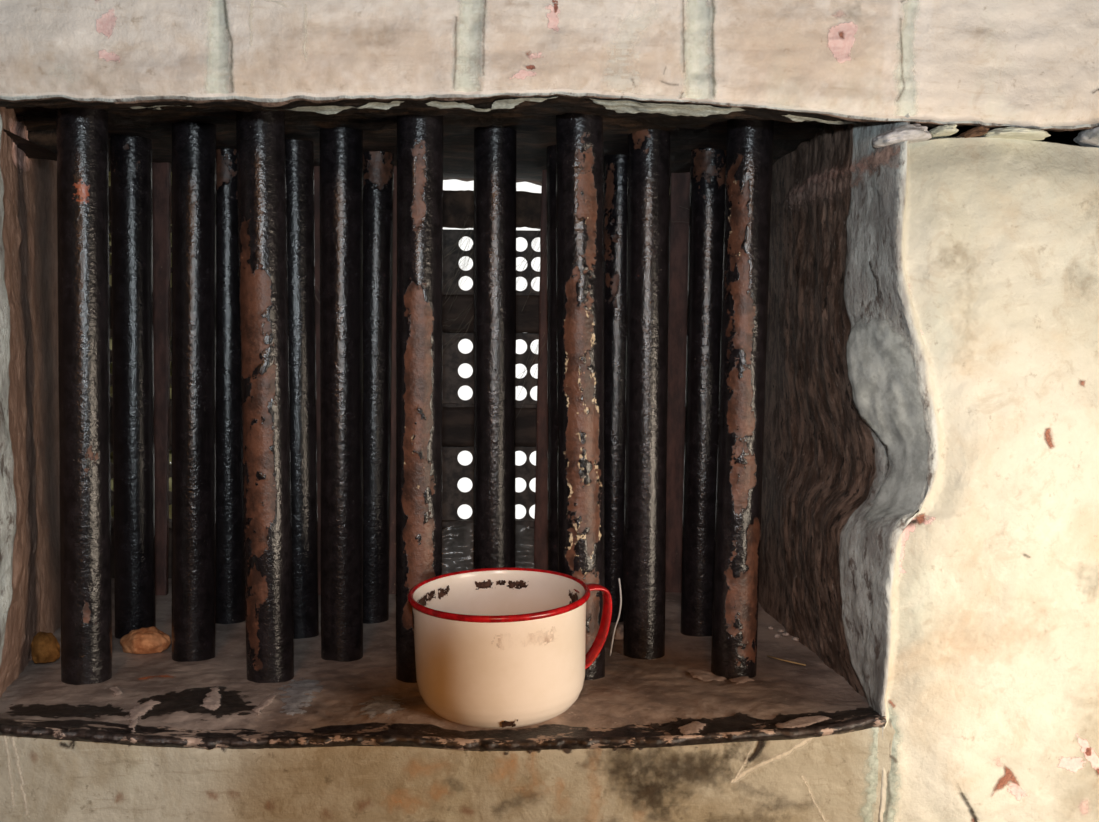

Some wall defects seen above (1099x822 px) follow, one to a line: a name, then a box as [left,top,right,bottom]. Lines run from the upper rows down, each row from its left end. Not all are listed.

peeling [7,678,324,732]
peeling [651,706,875,736]
peeling [1058,734,1099,775]
peeling [992,759,1026,800]
crack [961,793,978,822]